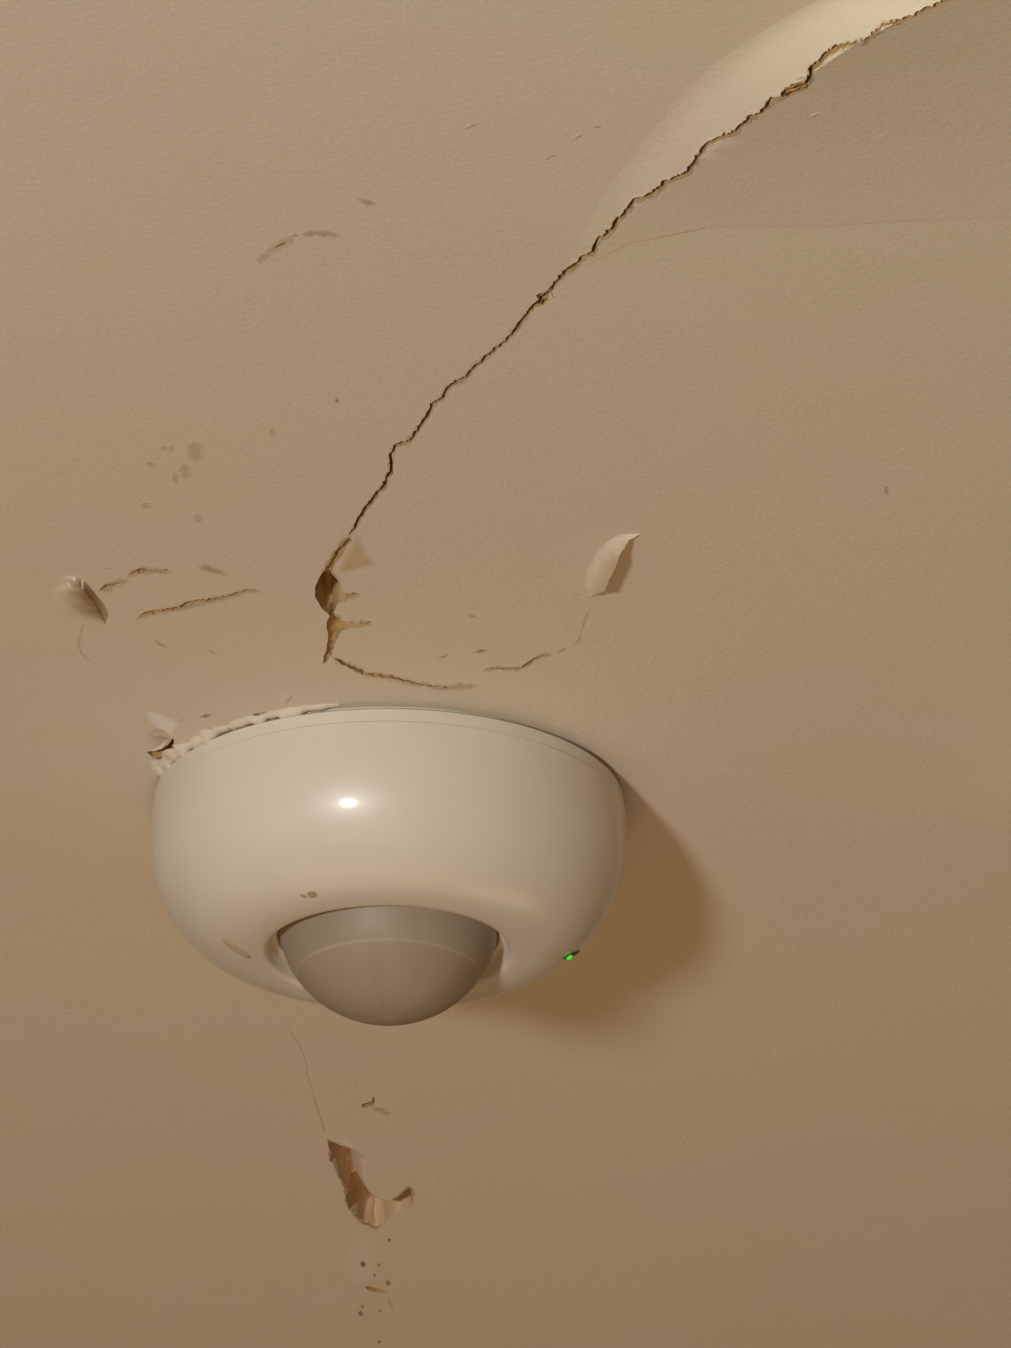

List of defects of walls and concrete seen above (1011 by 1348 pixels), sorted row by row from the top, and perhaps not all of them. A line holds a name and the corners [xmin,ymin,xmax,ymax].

crack [254,228,341,265]
crack [348,0,950,537]
peeling [46,576,105,665]
crack [97,563,263,650]
peeling [315,534,378,664]
crack [329,606,590,693]
peeling [571,533,639,597]
spalling [142,693,341,782]
spalling [327,1139,415,1317]